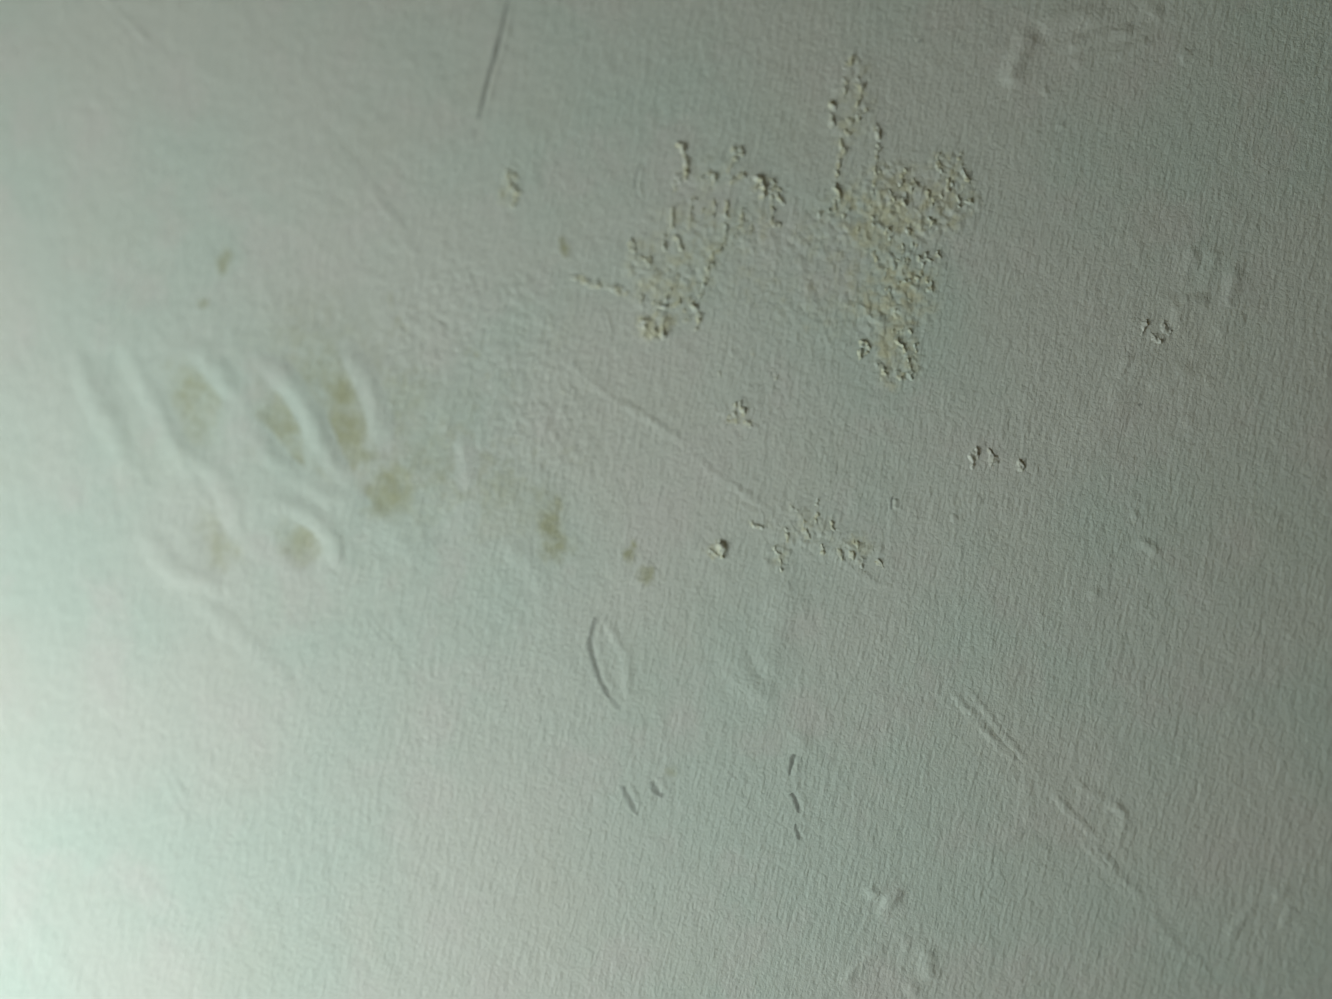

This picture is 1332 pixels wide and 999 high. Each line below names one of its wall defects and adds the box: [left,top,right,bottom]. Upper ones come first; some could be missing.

peeling [569,45,989,398]